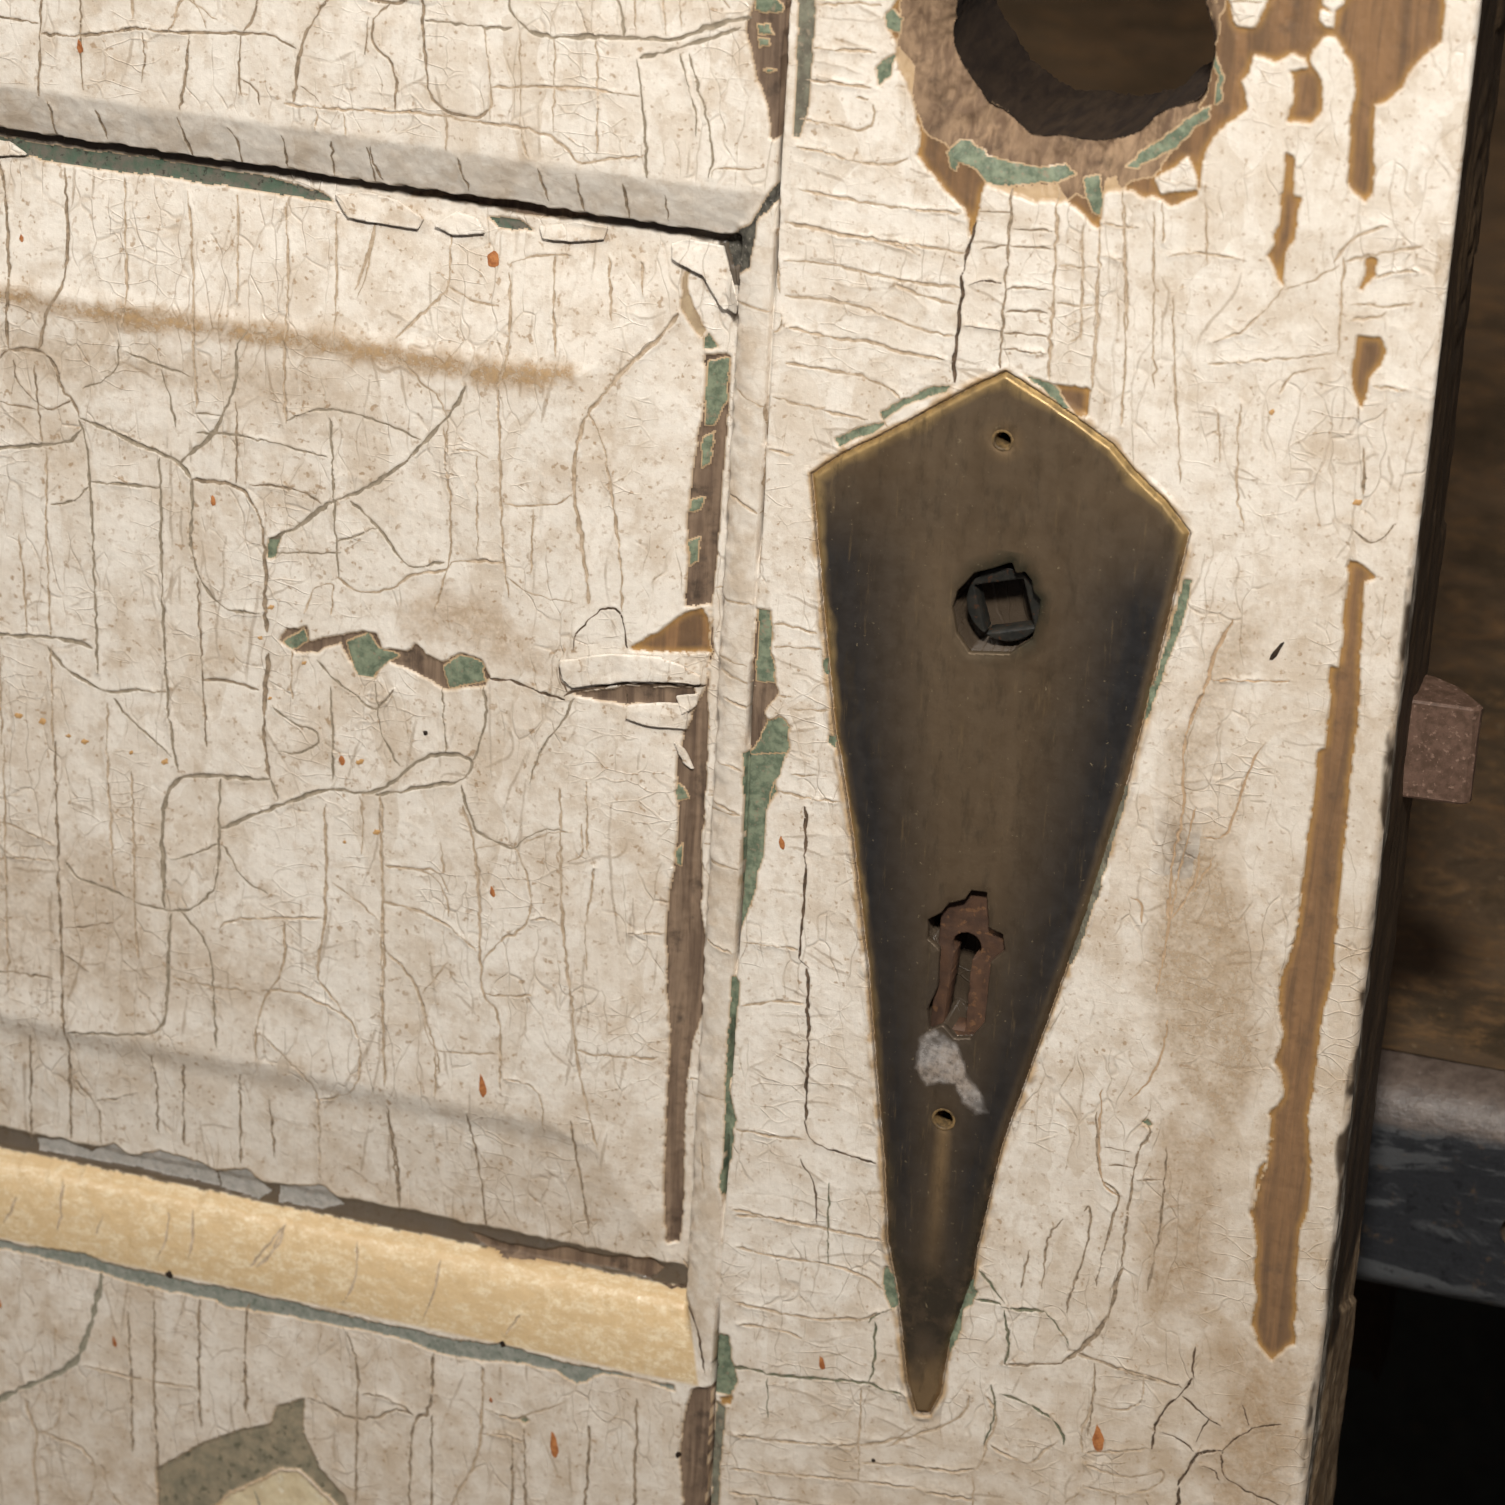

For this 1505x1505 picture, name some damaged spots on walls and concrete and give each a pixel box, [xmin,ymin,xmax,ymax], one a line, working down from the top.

peeling [0,136,608,242]
crack [815,0,881,8]
peeling [877,0,1445,234]
peeling [280,627,490,689]
crack [0,0,831,1234]
peeling [559,182,781,1242]
peeling [741,609,790,925]
crack [659,619,1290,1505]
peeling [1250,561,1375,1359]
crack [243,1303,251,1412]
crack [249,1224,286,1267]
crack [631,1399,639,1505]